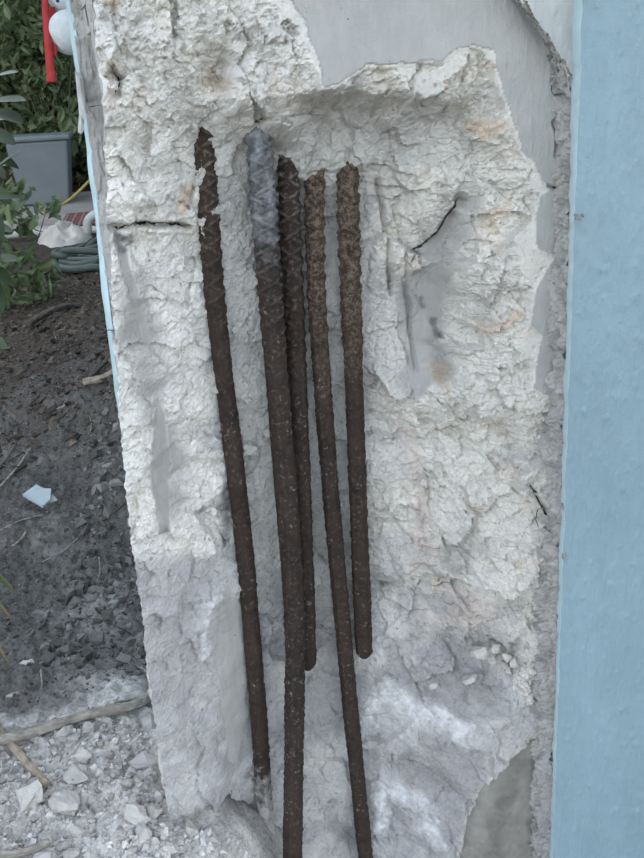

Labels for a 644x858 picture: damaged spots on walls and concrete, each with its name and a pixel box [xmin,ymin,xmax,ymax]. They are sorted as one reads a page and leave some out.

crack [112,221,185,237]
spalling [69,0,584,858]